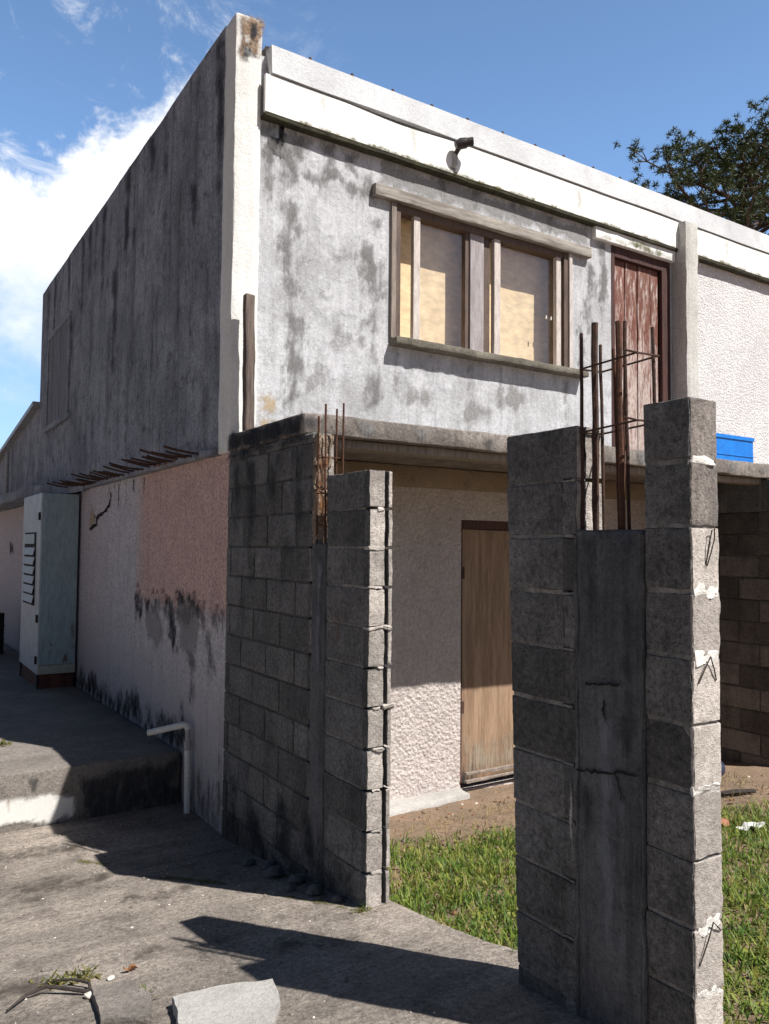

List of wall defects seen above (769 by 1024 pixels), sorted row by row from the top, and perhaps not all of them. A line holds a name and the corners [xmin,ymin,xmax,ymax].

water stain [215,39,225,157]
water stain [263,124,373,197]
water stain [123,171,135,250]
water stain [48,208,116,365]
water stain [278,201,300,295]
water stain [358,245,384,298]
water stain [286,311,325,400]
water stain [366,376,382,407]
water stain [464,382,524,422]
crack [89,492,111,530]
water stain [75,673,185,746]
crack [576,768,639,805]